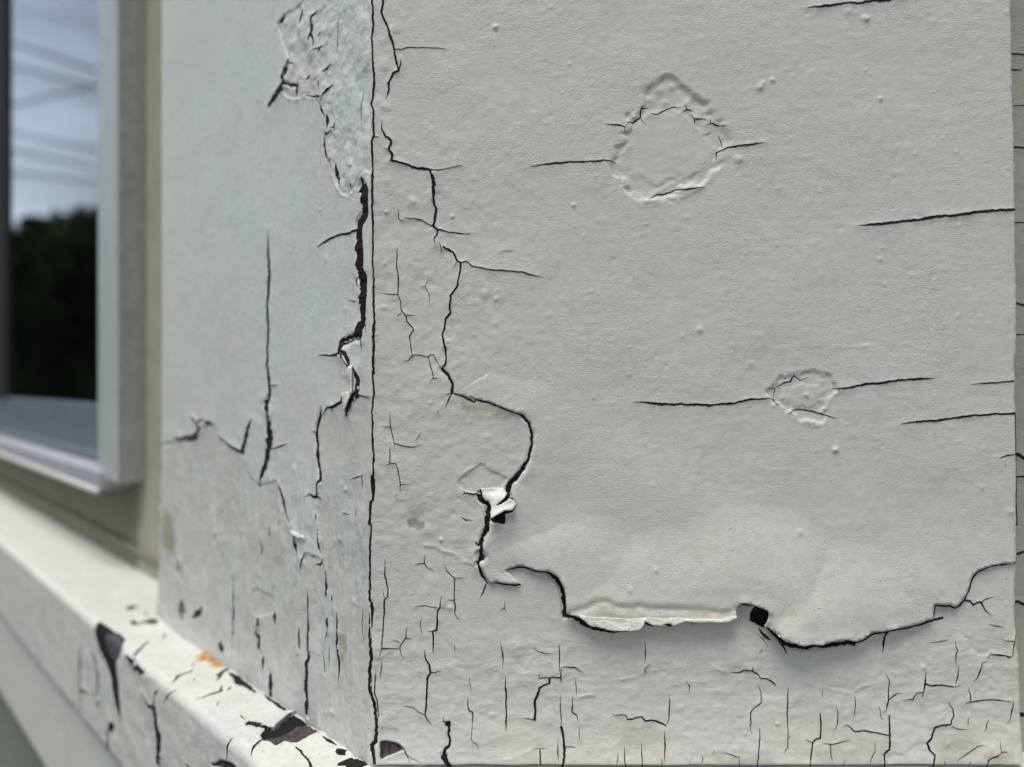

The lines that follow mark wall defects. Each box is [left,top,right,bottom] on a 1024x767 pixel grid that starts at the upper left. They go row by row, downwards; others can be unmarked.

peeling [276,0,371,196]
crack [857,208,1024,226]
crack [79,0,693,767]
crack [639,375,933,418]
crack [976,378,1014,386]
peeling [130,364,404,765]
peeling [454,373,1016,646]
crack [701,551,1024,767]